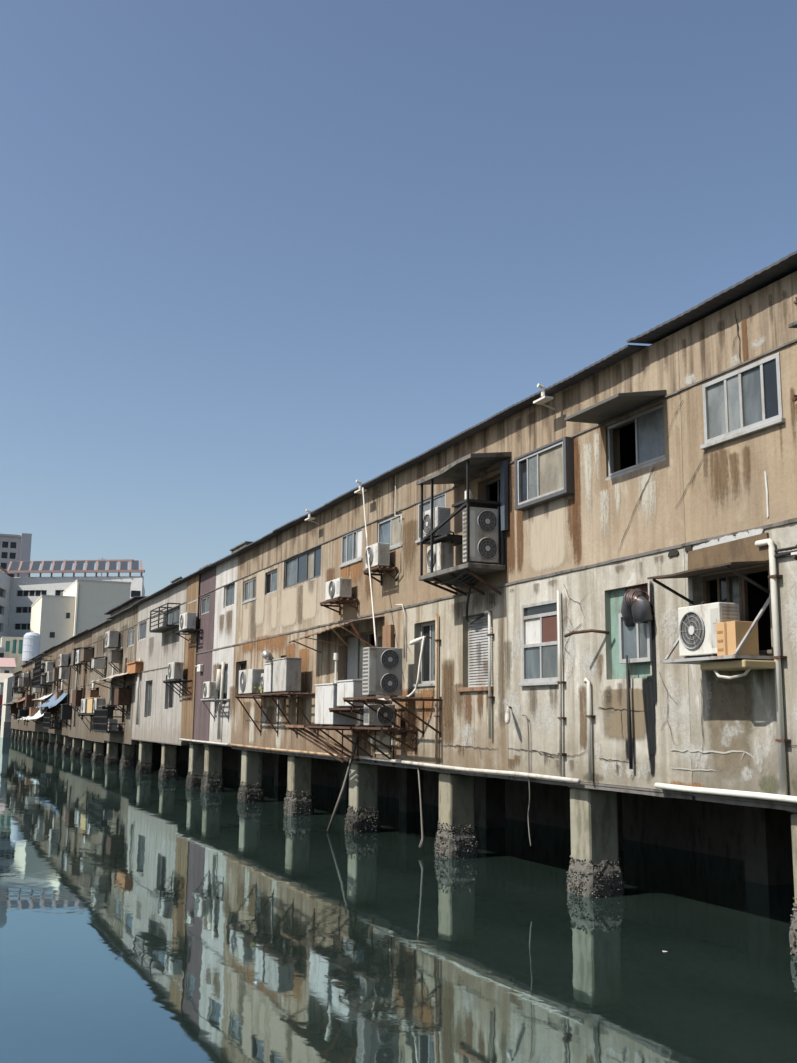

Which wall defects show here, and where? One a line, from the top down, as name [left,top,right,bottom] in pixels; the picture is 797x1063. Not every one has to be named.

rust [568,437,581,563]
crack [619,467,654,549]
spalling [668,471,797,557]
rust [398,660,463,753]